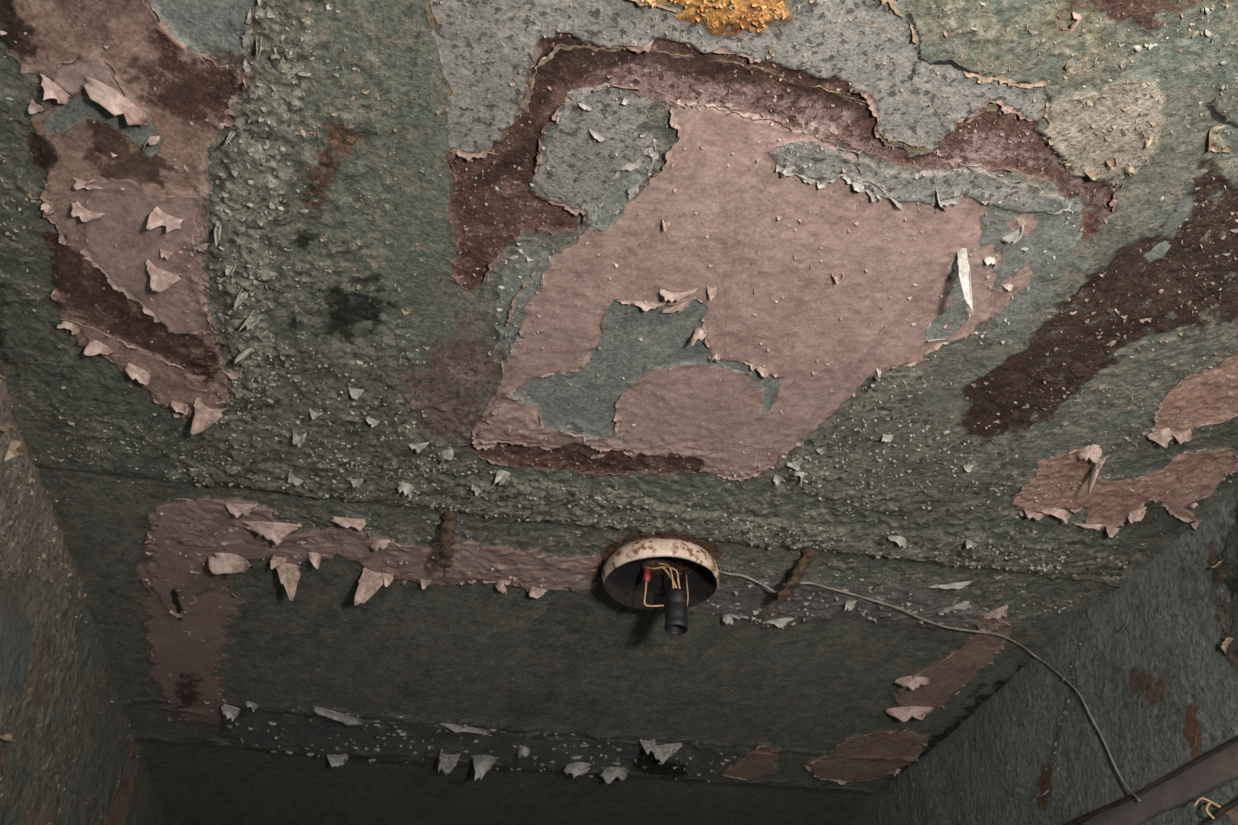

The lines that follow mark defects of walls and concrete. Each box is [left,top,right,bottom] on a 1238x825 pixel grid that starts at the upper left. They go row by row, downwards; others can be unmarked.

peeling [1105,13,1178,53]
peeling [1181,0,1229,43]
peeling [308,39,396,113]
peeling [1198,78,1238,135]
peeling [263,168,319,213]
peeling [0,218,32,252]
peeling [238,218,339,264]
peeling [1152,211,1234,322]
peeling [1095,300,1168,360]
peeling [1020,358,1146,419]
peeling [31,407,152,470]